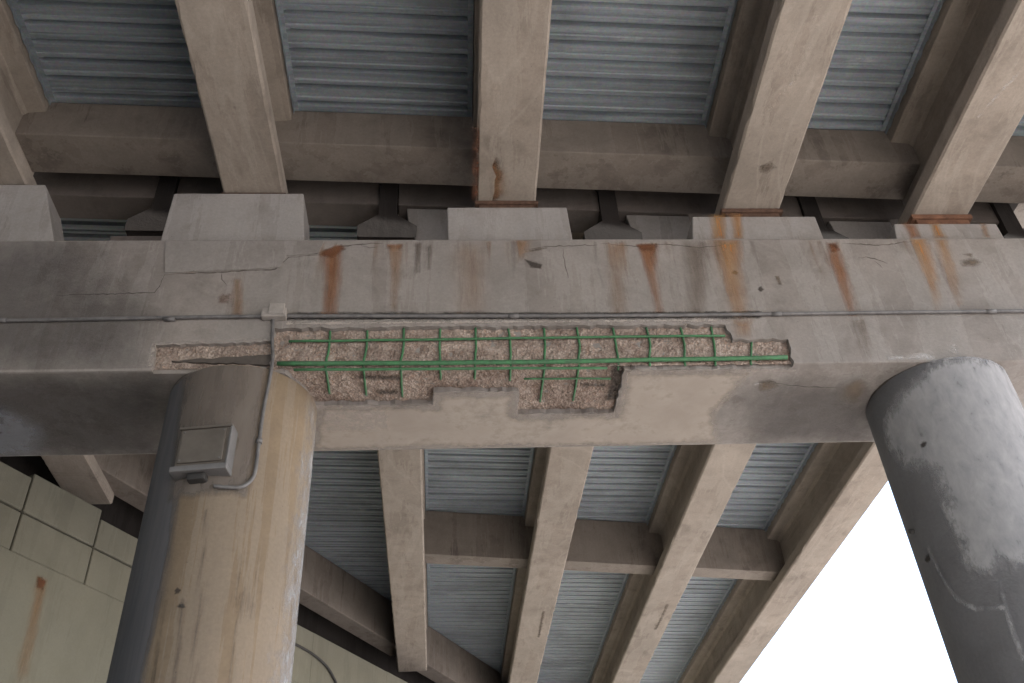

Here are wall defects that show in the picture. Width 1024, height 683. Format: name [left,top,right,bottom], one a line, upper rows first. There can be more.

crack [56,243,381,296]
rust [321,246,343,312]
rust [639,244,655,276]
rust [829,244,847,293]
spalling [172,326,792,410]